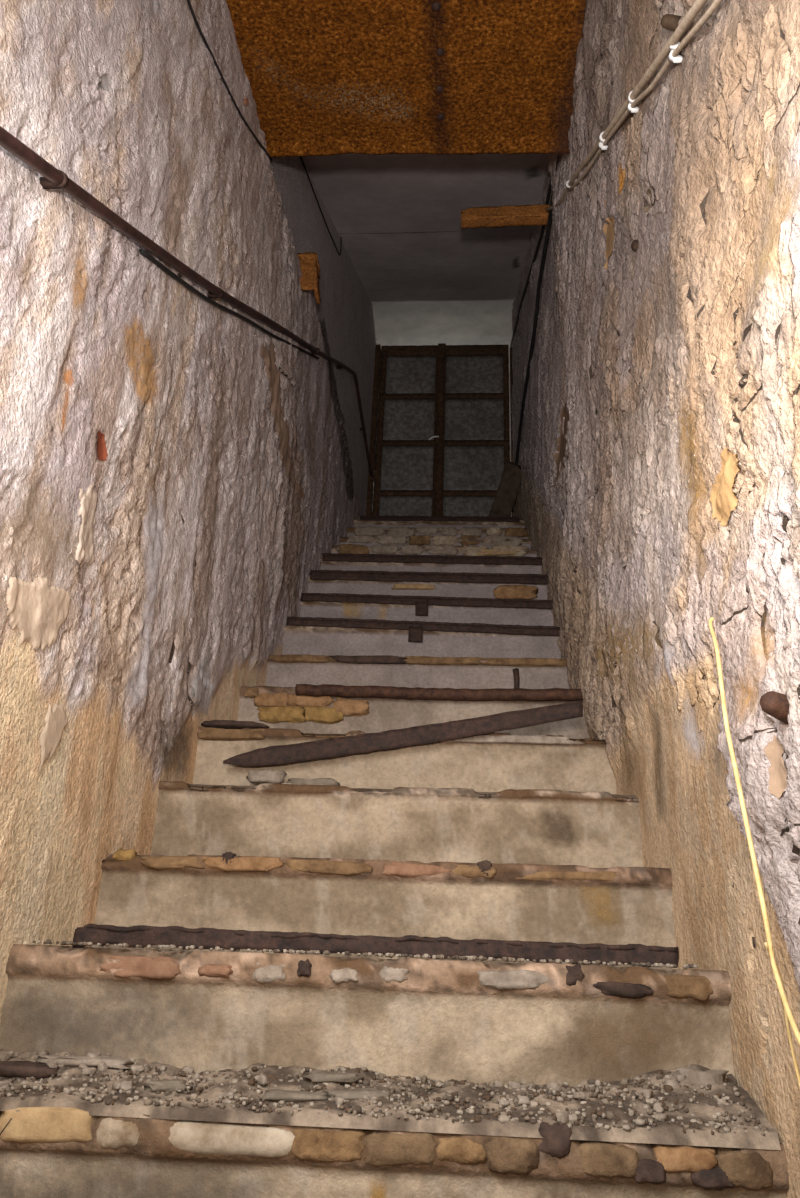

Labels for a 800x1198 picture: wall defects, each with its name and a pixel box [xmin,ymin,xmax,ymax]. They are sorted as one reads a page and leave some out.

spalling [709,447,740,526]